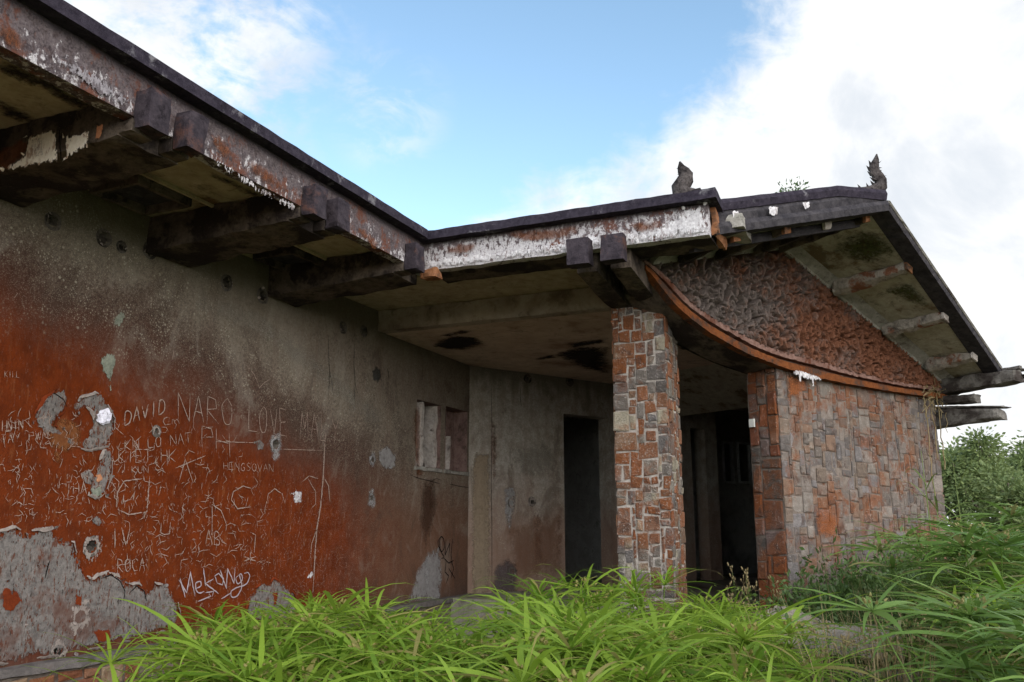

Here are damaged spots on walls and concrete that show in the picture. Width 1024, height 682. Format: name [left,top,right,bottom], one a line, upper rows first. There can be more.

peeling [52,54,129,105]
peeling [0,124,103,172]
peeling [621,202,707,243]
peeling [425,242,566,268]
water stain [434,330,480,350]
water stain [536,340,608,373]
peeling [33,353,116,500]
spalling [374,446,395,469]
peeling [0,516,181,666]